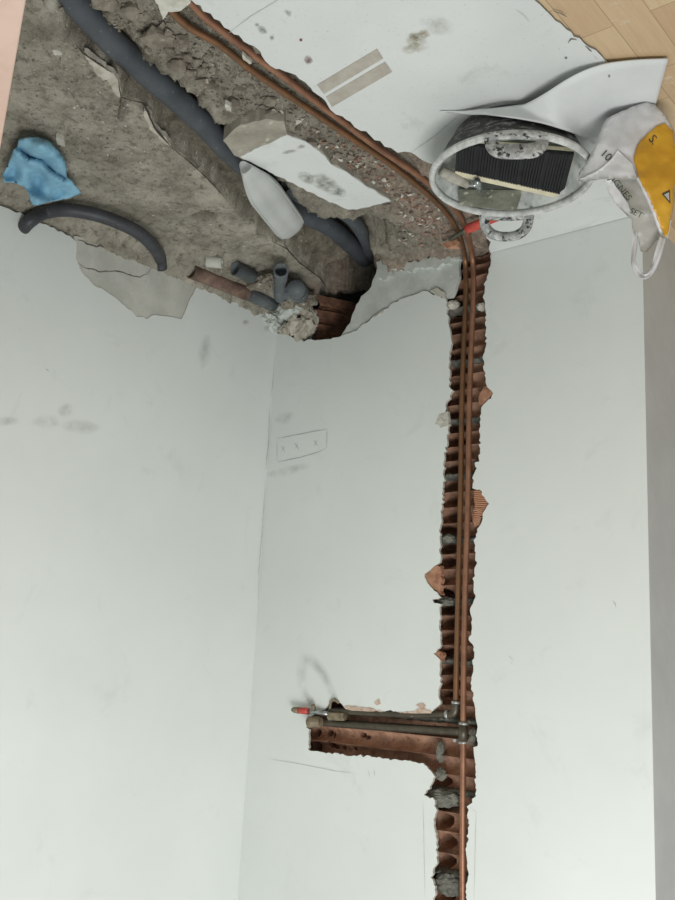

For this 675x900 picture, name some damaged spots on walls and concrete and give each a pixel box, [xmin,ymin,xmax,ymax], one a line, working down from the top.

peeling [155,0,191,19]
peeling [73,236,196,319]
peeling [261,256,463,342]
spalling [479,386,493,406]
spalling [435,411,451,428]
spalling [472,490,489,528]
spalling [425,565,445,596]
spalling [344,699,382,712]
spalling [399,703,432,717]